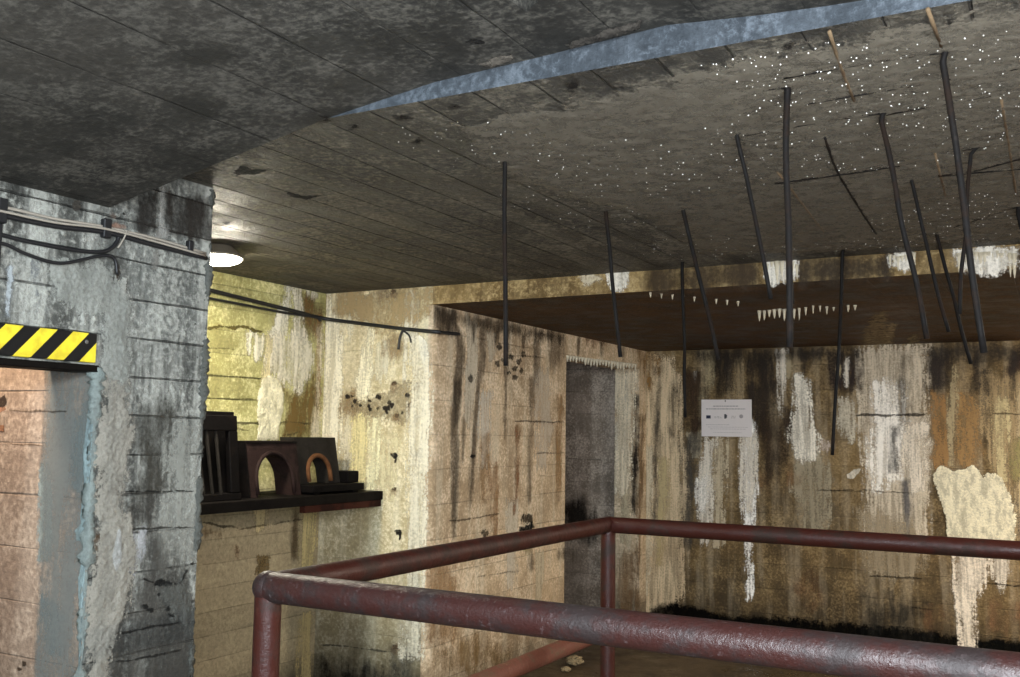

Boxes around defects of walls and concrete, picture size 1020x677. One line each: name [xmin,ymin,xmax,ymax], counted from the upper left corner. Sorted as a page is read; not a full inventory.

spalling [451,3,1020,255]
water stain [648,252,913,295]
water stain [953,246,1020,277]
water stain [246,285,434,550]
spalling [345,380,419,426]
water stain [434,306,564,535]
spalling [495,343,526,380]
water stain [614,311,1020,541]
water stain [110,400,198,677]
water stain [565,499,597,524]
water stain [646,535,961,646]
water stain [974,639,1020,652]